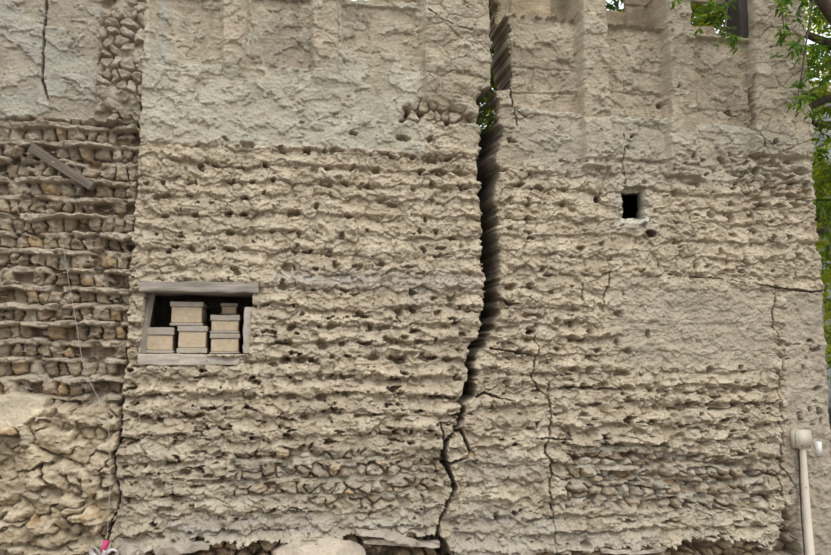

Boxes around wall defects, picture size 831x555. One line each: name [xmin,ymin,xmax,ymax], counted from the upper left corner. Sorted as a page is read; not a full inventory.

crack [41,0,49,100]
spalling [0,116,276,555]
spalling [353,528,440,555]
crack [428,0,574,555]
spalling [451,510,800,555]
crack [667,259,824,542]